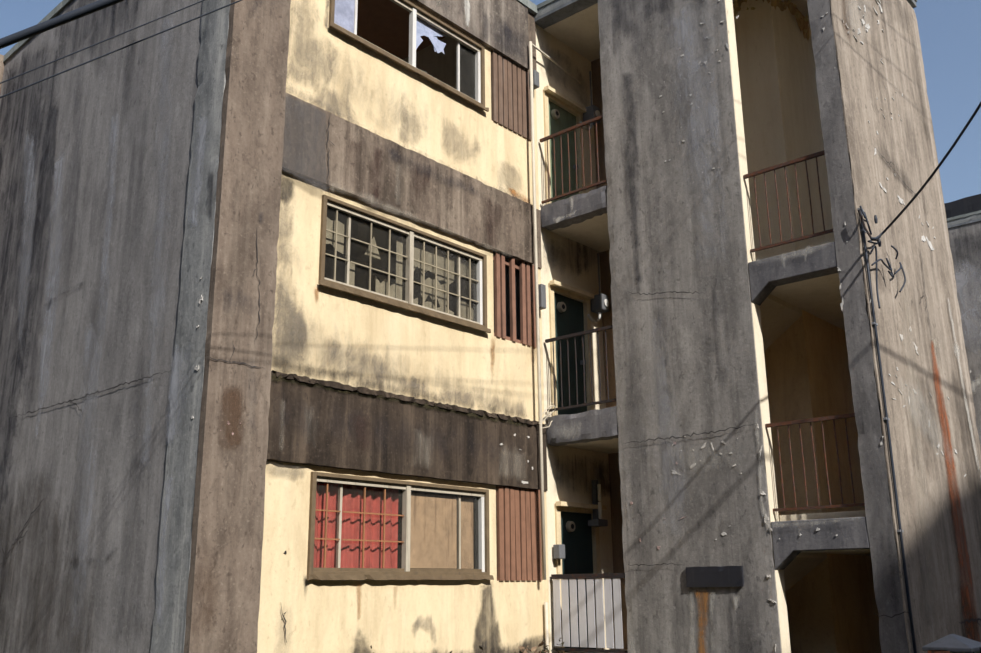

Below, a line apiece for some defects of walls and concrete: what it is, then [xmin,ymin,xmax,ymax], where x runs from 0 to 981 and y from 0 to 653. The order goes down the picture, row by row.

water stain [276,294,310,371]
crack [10,370,171,419]
water stain [223,390,241,444]
water stain [332,355,435,399]
crack [627,423,757,445]
corrosion [931,343,980,642]
water stain [474,586,545,653]